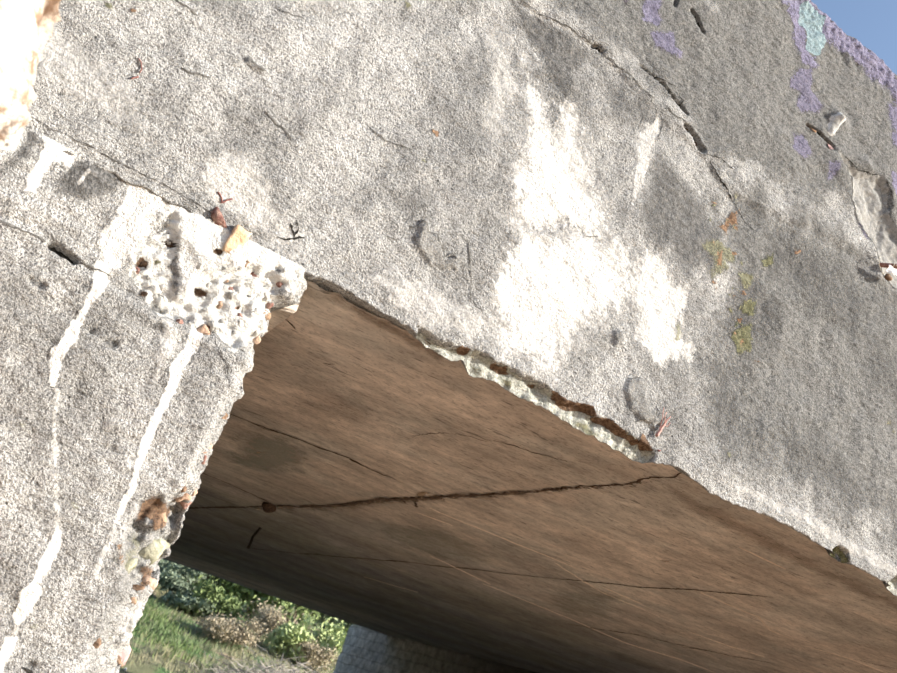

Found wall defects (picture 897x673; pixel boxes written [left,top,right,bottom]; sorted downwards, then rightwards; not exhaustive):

crack [30,116,211,213]
crack [522,0,758,233]
crack [845,156,893,198]
crack [0,219,112,277]
water stain [174,236,222,292]
water stain [351,0,897,578]
water stain [0,130,172,673]
water stain [113,317,203,524]
crack [231,414,443,508]
spalling [416,332,655,463]
crack [470,473,681,498]
crack [251,548,776,598]